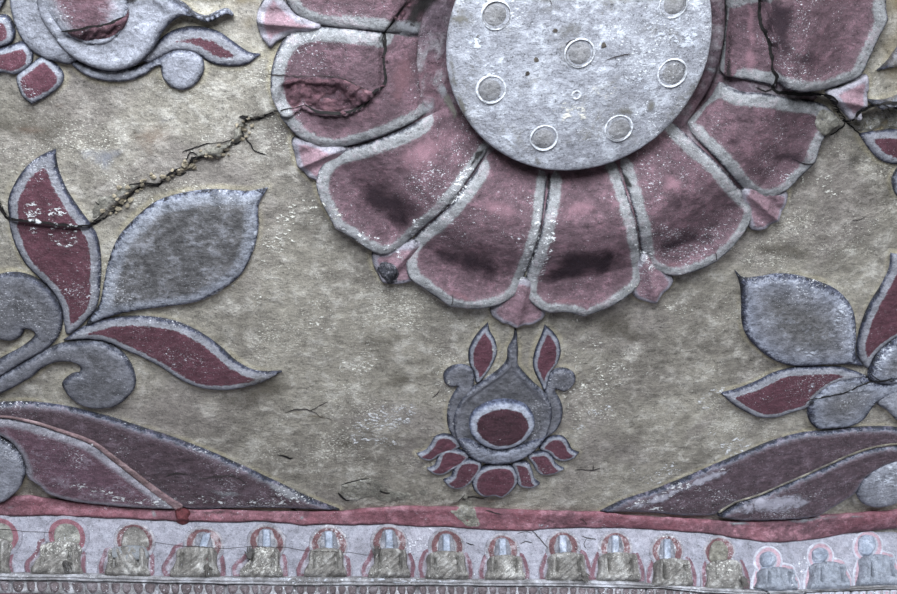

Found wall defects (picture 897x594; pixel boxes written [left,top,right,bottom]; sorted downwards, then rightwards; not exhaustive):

crack [0,2,407,228]
spalling [283,78,374,113]
crack [756,0,897,136]
crack [808,372,897,404]